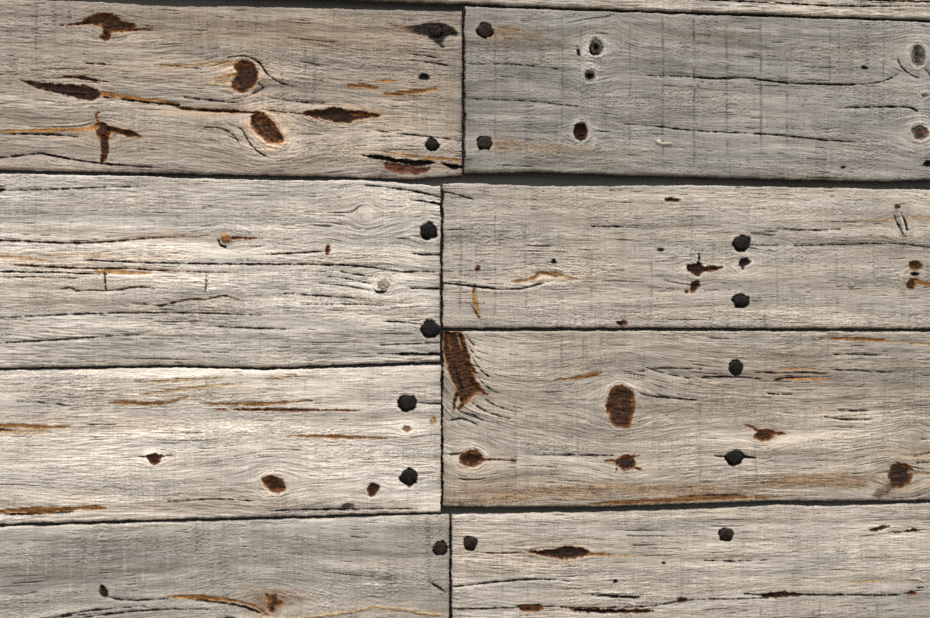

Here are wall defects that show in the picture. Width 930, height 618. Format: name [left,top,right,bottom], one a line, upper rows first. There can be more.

crack [0,133,153,191]
crack [418,337,512,425]
crack [56,596,234,618]